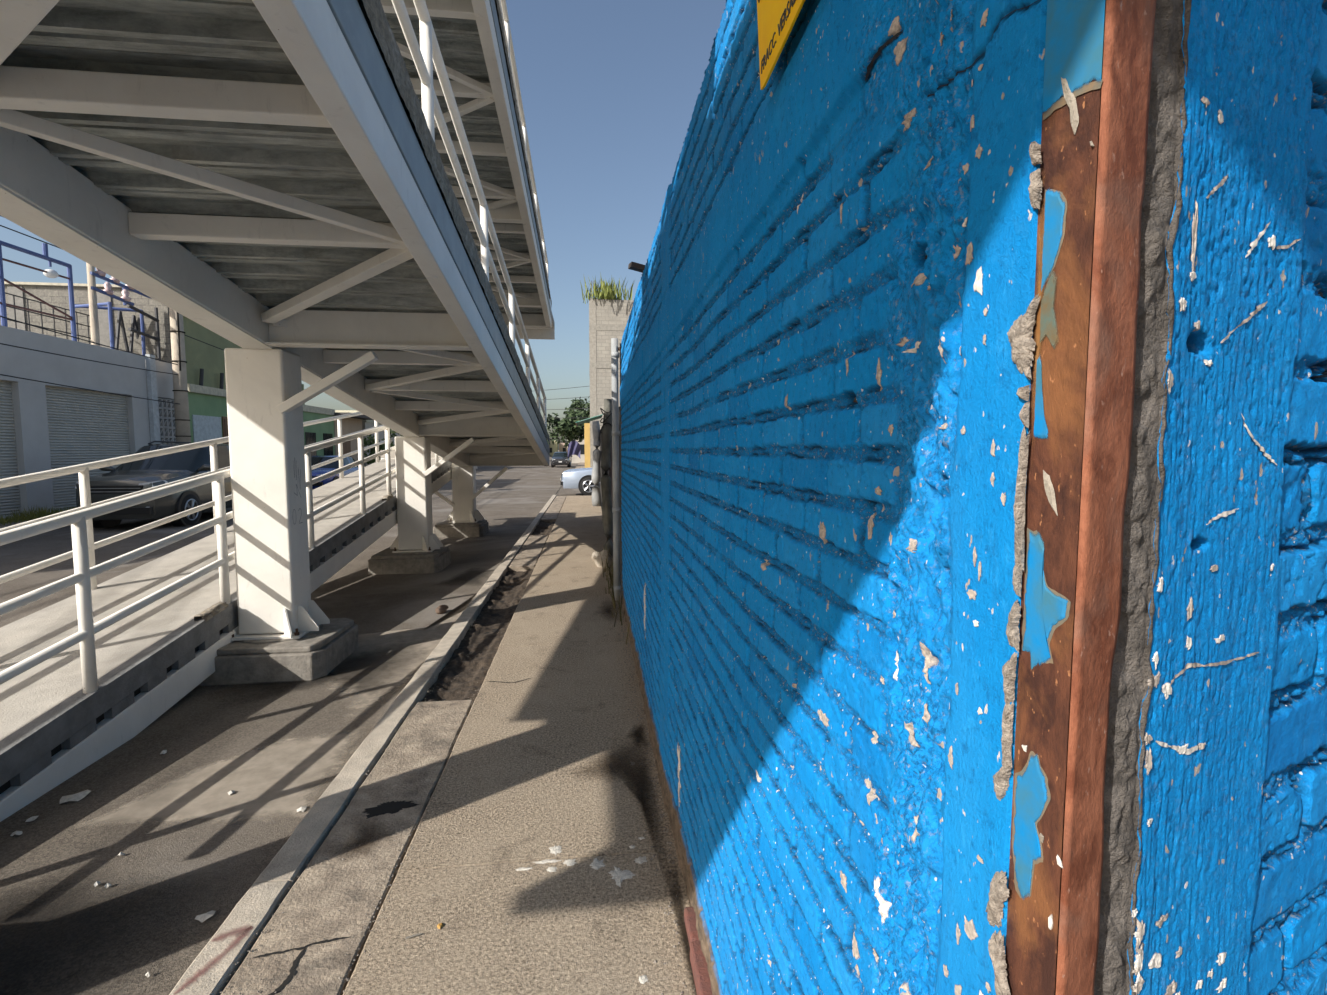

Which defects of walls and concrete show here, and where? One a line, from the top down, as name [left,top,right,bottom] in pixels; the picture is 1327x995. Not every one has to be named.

crack [865,30,903,82]
crack [927,0,1039,97]
peeling [1042,0,1105,113]
corrosion [1033,237,1043,408]
spalling [1094,0,1227,995]
peeling [953,141,1068,995]
damp [84,595,476,825]
peeling [920,642,939,684]
damp [597,727,657,849]
crack [253,936,351,995]
damp [670,872,697,995]
peeling [874,878,892,923]